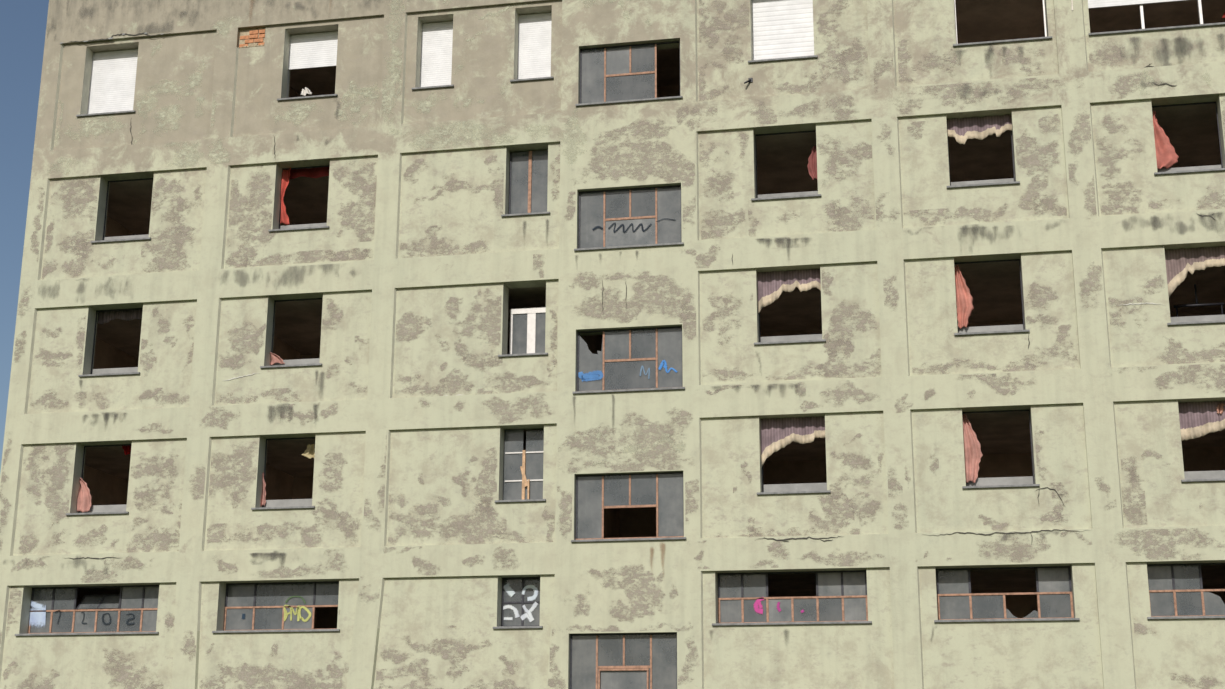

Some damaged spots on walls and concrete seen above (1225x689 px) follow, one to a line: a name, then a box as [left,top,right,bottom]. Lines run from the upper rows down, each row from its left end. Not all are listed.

spalling [213,21,266,48]
peeling [751,0,1060,137]
peeling [588,0,759,268]
peeling [226,163,376,268]
peeling [396,289,557,424]
peeling [576,272,739,345]
peeling [76,442,256,583]
peeling [207,448,527,578]
crack [756,535,844,543]
crack [922,487,1085,544]
peeling [1099,451,1221,560]
peeling [573,566,678,632]